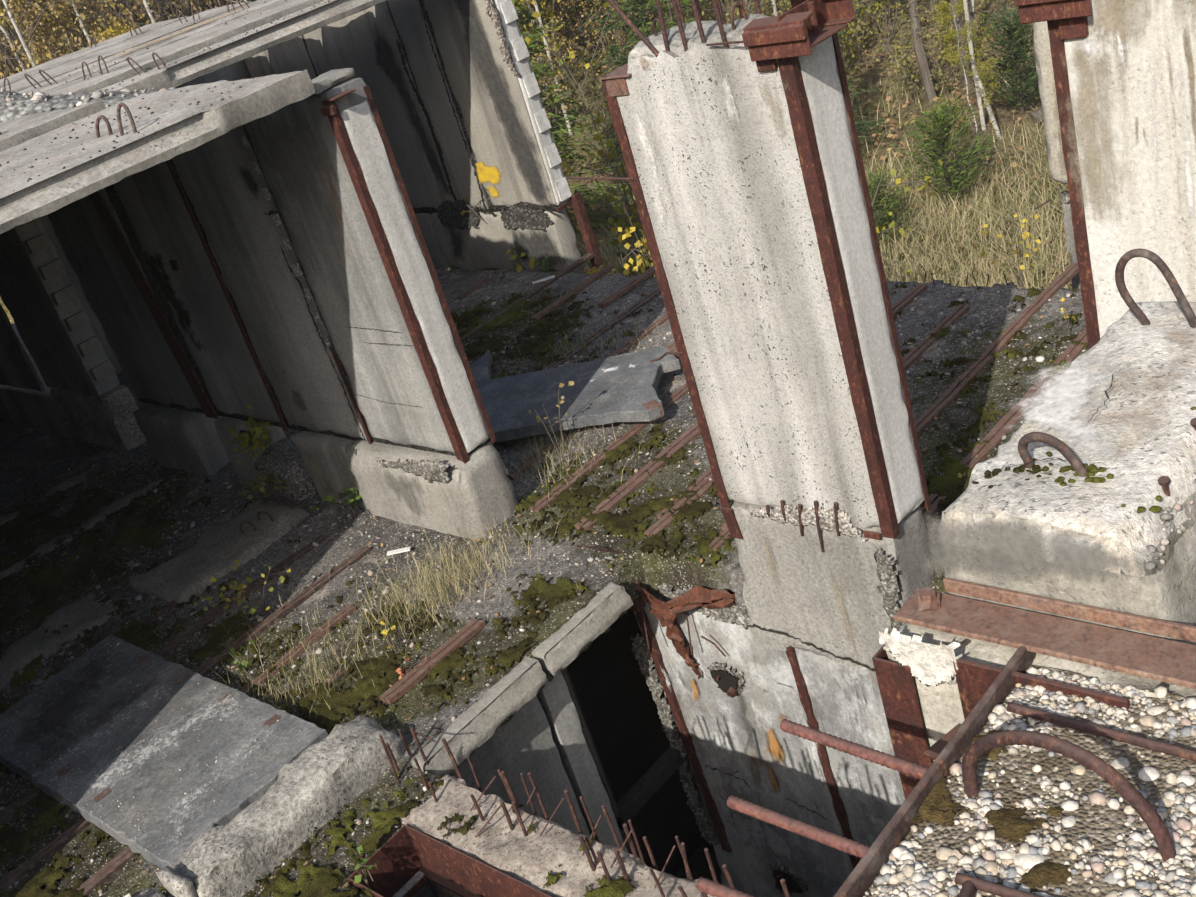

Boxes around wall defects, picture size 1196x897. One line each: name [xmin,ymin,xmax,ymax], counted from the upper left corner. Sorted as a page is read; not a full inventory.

leakage [374,30,450,195]
leakage [455,0,548,202]
leakage [1056,44,1113,215]
leakage [1095,0,1148,60]
leakage [1183,33,1196,212]
spalling [750,500,868,552]
spalling [630,634,719,845]
rust [625,581,735,853]
spalling [707,662,744,698]
crack [746,624,875,672]
spalling [879,628,962,687]
spalling [770,862,808,895]